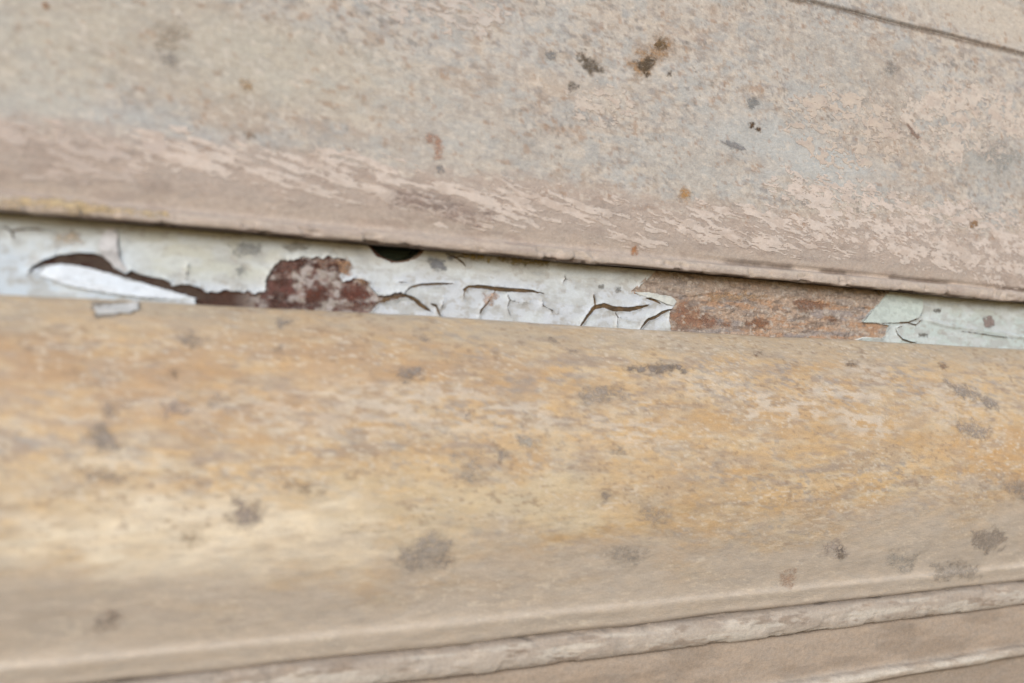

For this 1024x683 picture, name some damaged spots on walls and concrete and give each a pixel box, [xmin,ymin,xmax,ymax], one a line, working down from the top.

peeling [0,78,1024,298]
peeling [28,228,404,318]
rust [260,258,404,311]
crack [400,254,568,315]
crack [580,295,671,329]
rust [670,301,730,328]
rust [795,300,837,321]